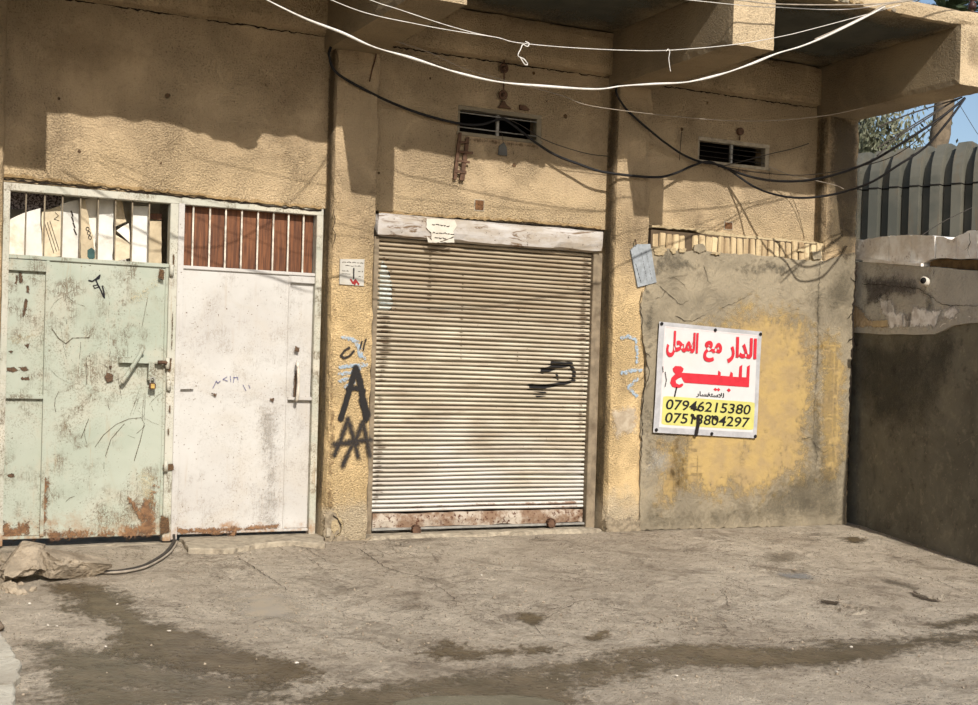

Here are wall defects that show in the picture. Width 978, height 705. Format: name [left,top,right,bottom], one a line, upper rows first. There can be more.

peeling [853,298,970,329]
rust [2,477,279,541]
leakage [26,582,325,705]
leakage [297,612,978,705]